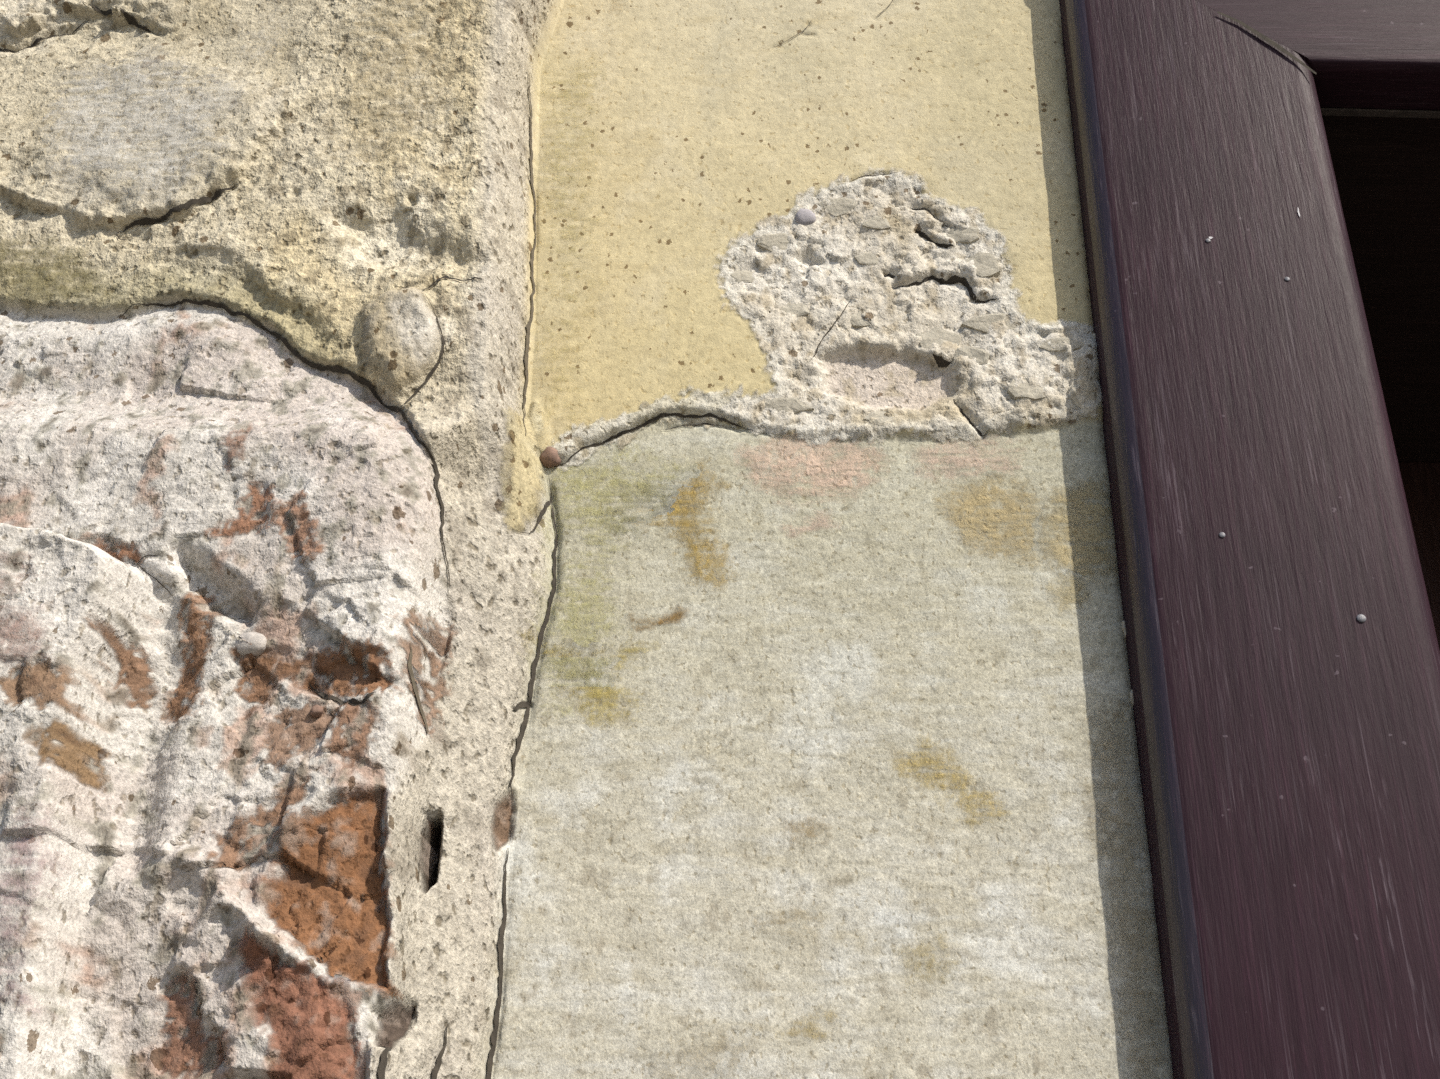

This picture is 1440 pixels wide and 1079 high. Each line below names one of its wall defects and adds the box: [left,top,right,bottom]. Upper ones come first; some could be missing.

crack [0,0,165,53]
damp [652,476,724,581]
damp [744,436,880,496]
damp [926,442,1118,607]
peeling [0,661,109,788]
peeling [86,593,218,721]
peeling [231,612,456,768]
damp [544,565,621,720]
damp [658,611,683,624]
flaking render [479,168,1173,1079]
spalling [423,823,441,892]
peeling [208,776,414,1079]